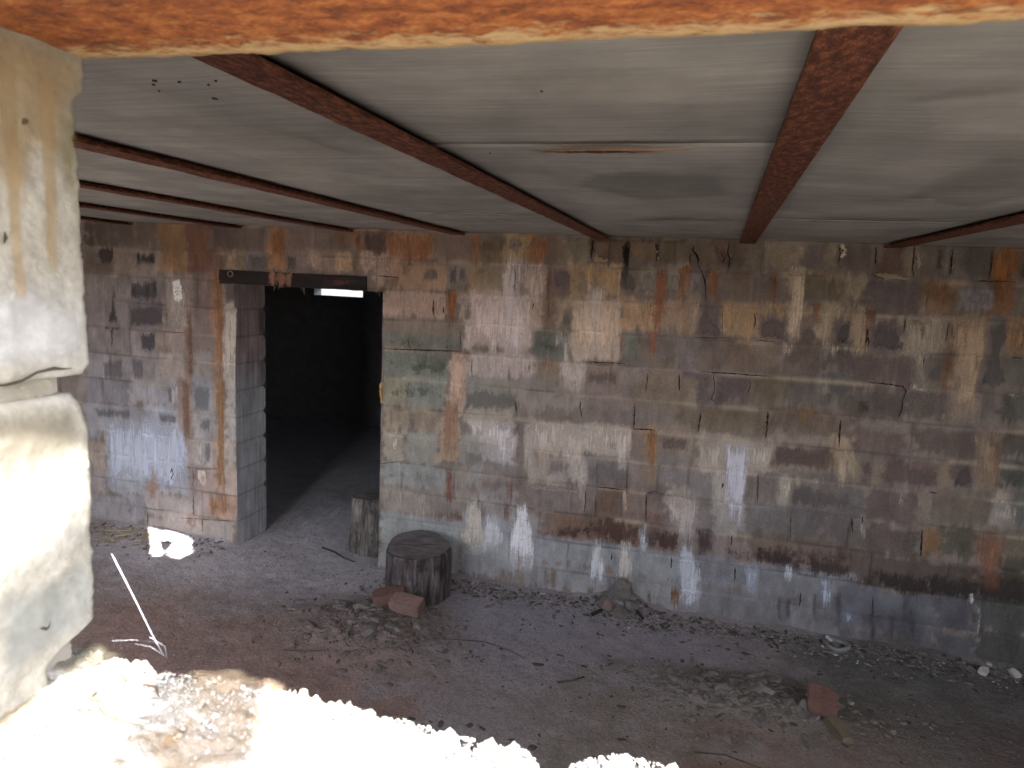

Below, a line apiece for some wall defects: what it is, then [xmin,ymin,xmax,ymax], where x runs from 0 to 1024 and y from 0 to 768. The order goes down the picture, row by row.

crack [689,242,732,299]
crack [869,382,906,417]
efflorescence [461,499,534,564]
water stain [552,446,937,606]
water stain [735,546,1024,633]